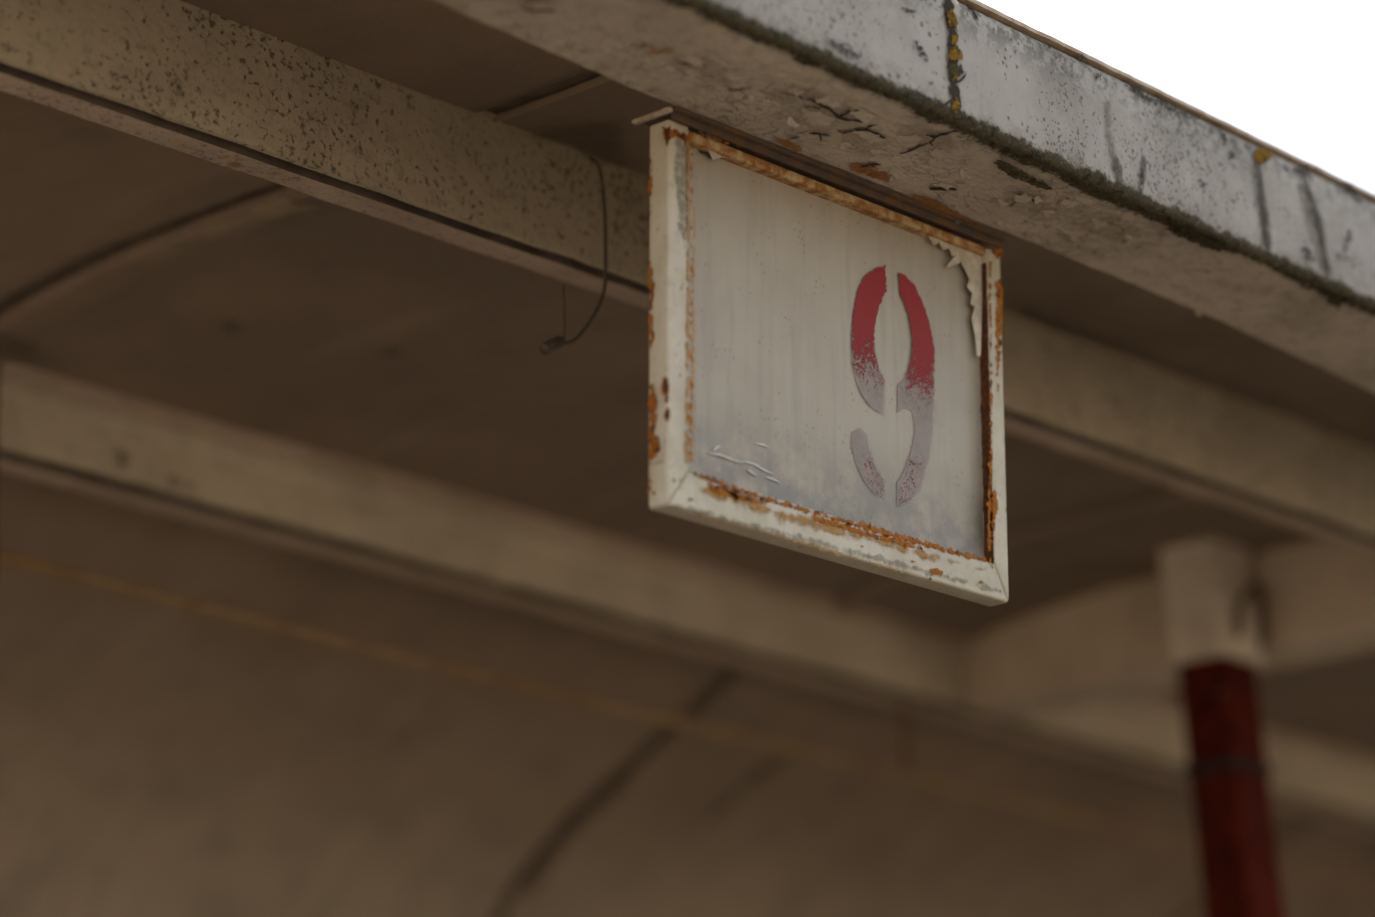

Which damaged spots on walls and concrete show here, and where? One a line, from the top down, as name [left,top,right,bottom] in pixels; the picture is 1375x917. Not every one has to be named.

crack [677,0,979,168]
water stain [829,39,861,61]
water stain [1125,84,1199,119]
water stain [1113,148,1122,185]
water stain [1255,161,1271,253]
water stain [1283,164,1363,271]